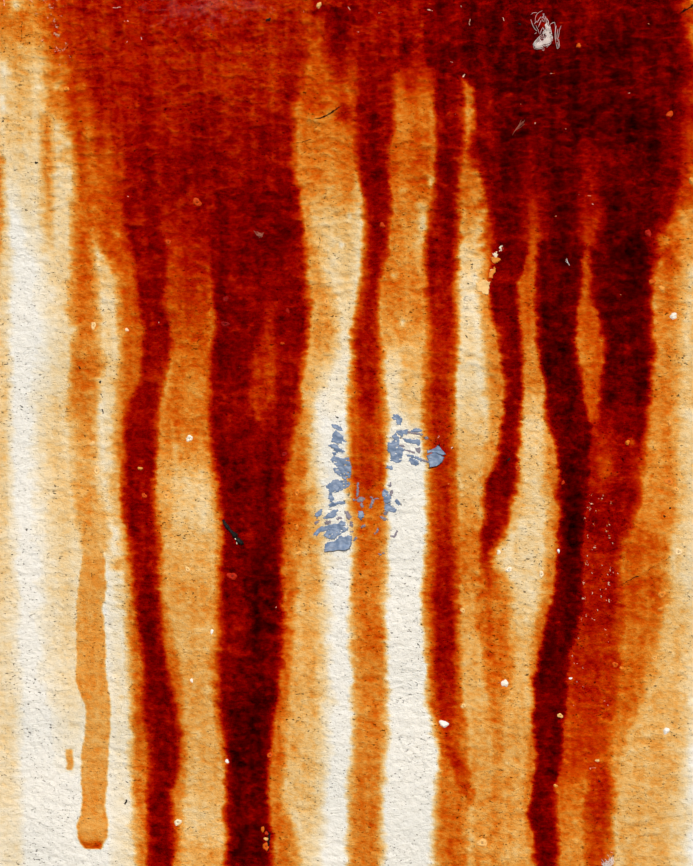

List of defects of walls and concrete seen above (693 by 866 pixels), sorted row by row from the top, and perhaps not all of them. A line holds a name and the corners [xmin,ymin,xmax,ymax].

rust [74,196,95,310]
rust [73,346,99,400]
peeling [313,424,400,552]
peeling [385,414,446,470]
rust [517,199,593,866]
rust [555,179,682,866]